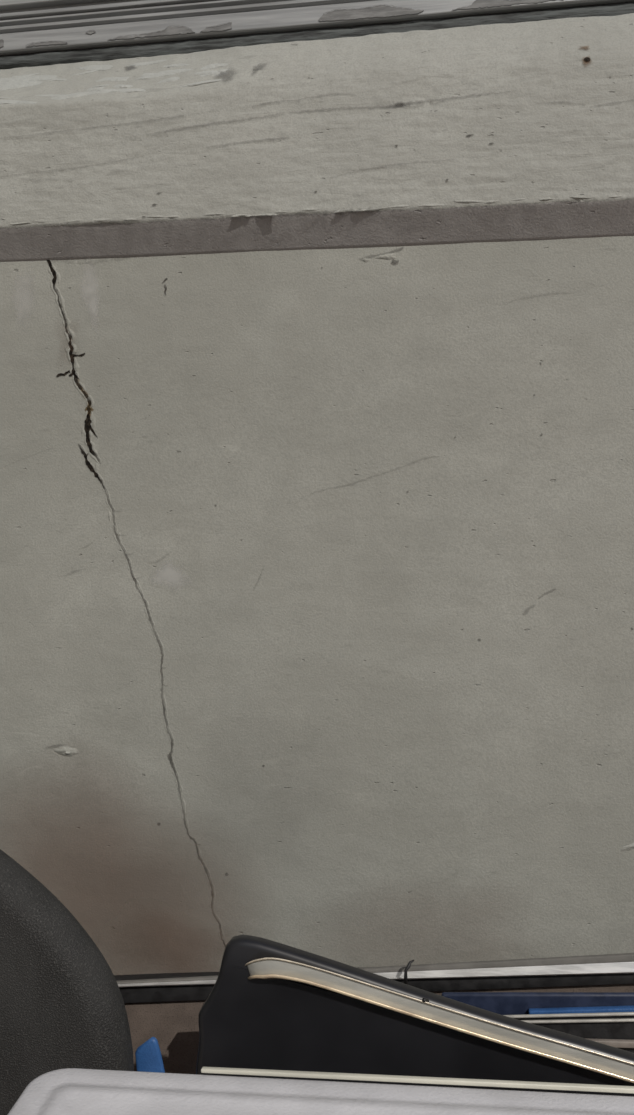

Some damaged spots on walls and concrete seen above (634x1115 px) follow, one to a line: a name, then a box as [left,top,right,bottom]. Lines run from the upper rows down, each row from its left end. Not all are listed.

crack [46,260,227,949]